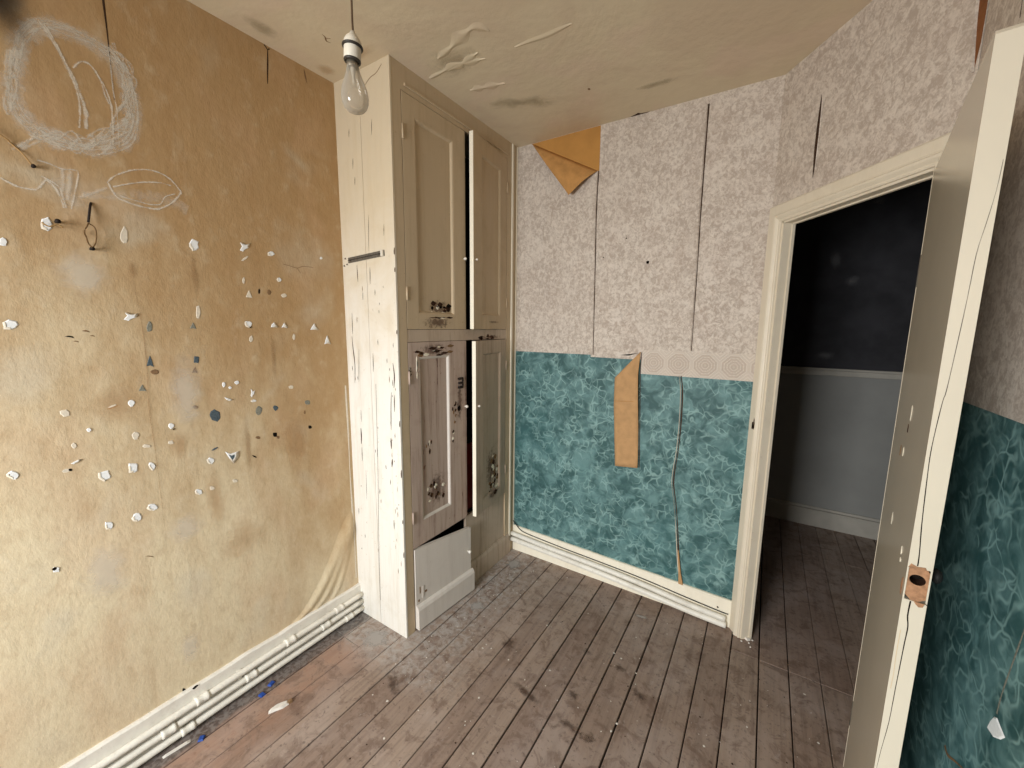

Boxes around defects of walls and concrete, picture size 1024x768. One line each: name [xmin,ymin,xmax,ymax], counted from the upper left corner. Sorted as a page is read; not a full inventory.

peeling [429,22,490,79]
peeling [532,125,601,171]
flaking render [41,217,52,231]
flaking render [120,226,128,243]
flaking render [2,319,19,330]
peeling [614,352,642,468]
flaking render [207,447,239,464]
flaking render [98,470,111,481]
flaking render [128,462,156,473]
flaking render [131,504,158,522]